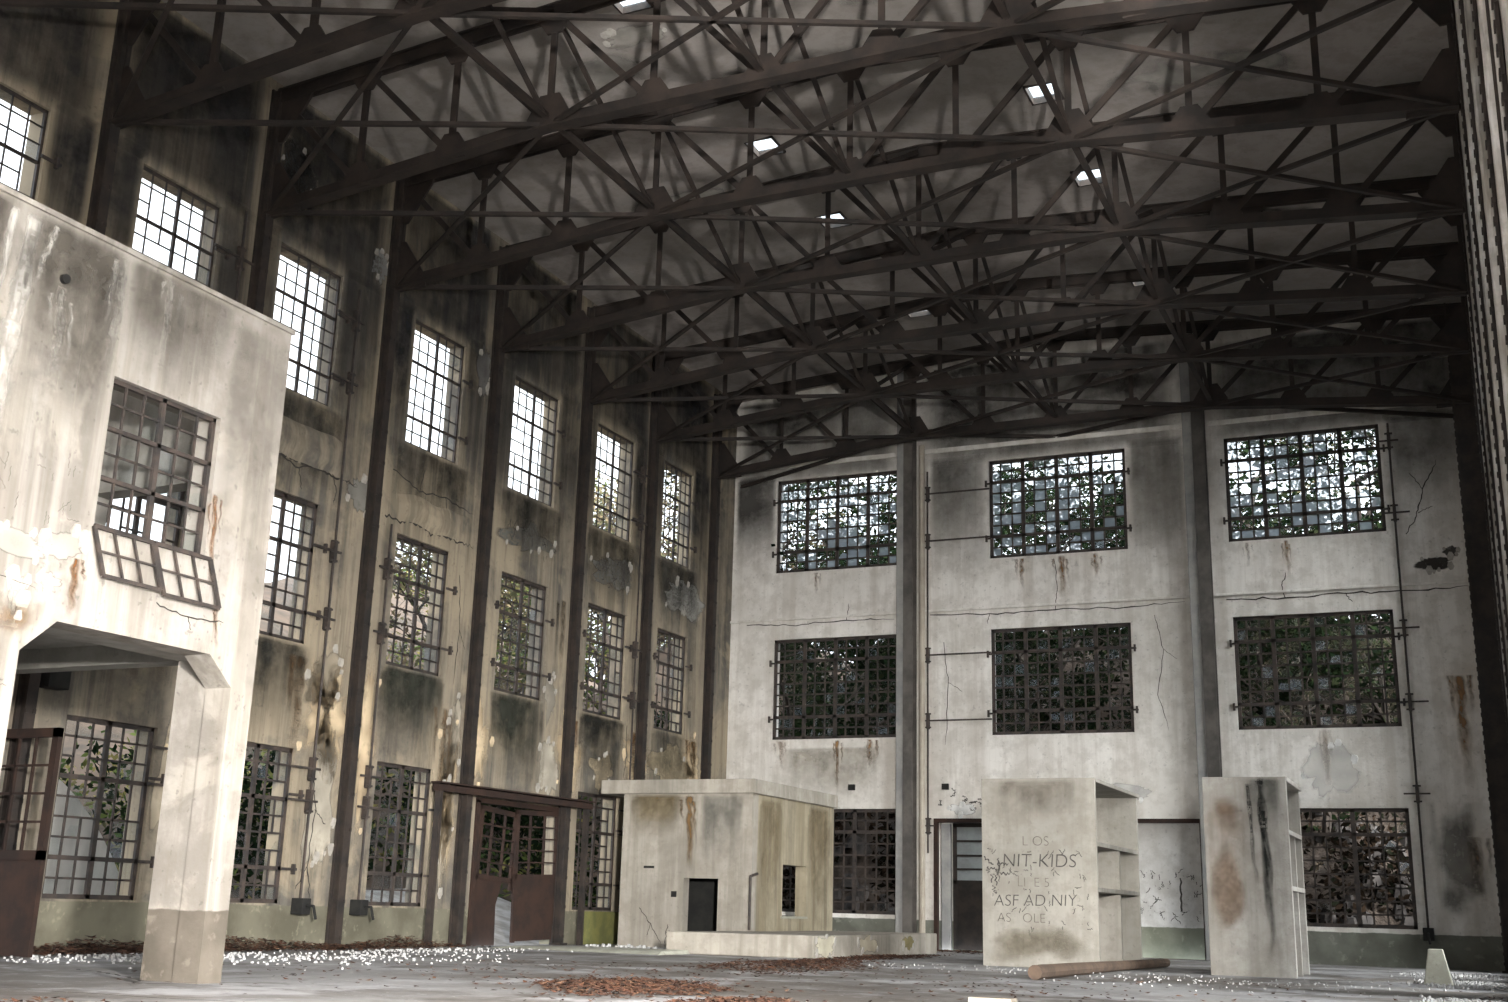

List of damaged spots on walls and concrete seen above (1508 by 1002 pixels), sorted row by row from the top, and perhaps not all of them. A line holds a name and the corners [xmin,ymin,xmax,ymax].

leakage [0,196,184,394]
peeling [0,519,92,620]
rust [208,497,222,555]
spalling [1414,546,1461,575]
rust [1447,675,1471,750]
leakage [1442,820,1481,908]